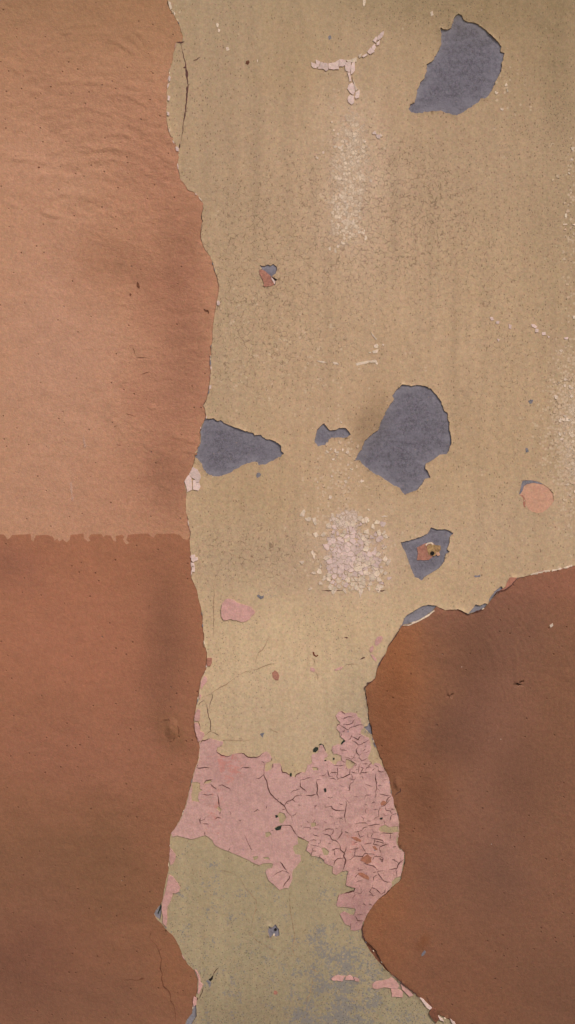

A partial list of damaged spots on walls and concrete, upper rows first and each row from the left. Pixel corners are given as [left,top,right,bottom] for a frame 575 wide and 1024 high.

peeling [311,31,384,105]
spalling [409,14,508,115]
spalling [259,264,277,287]
spalling [185,418,284,492]
spalling [299,384,453,597]
spalling [519,376,575,513]
spalling [402,605,436,626]
crack [166,640,404,1006]
peeling [154,658,456,1024]